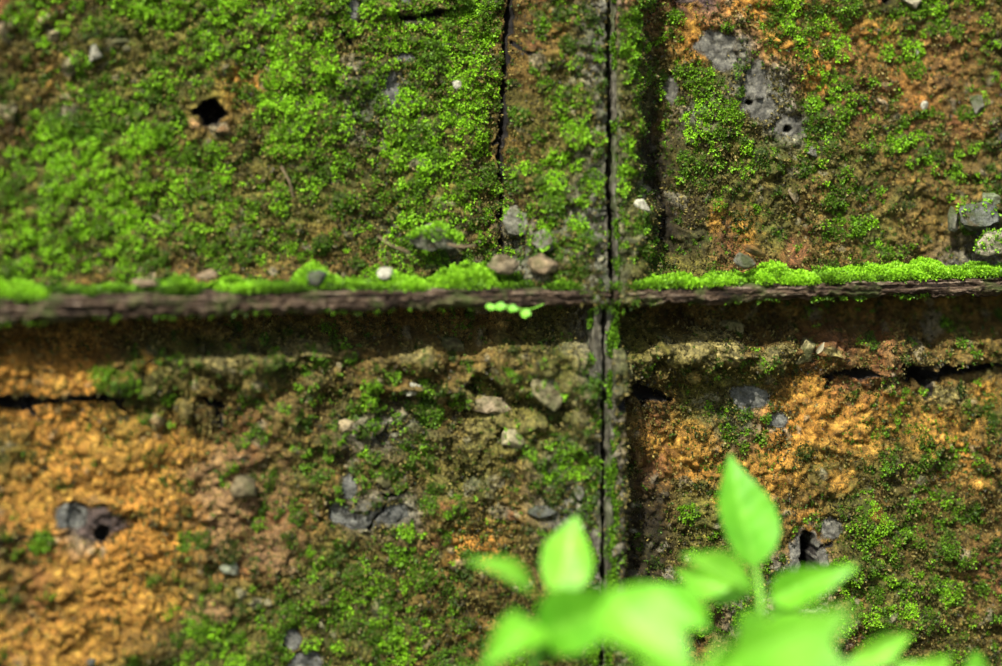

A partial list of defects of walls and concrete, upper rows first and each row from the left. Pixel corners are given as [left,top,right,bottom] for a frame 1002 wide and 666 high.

crack [491,0,533,255]
crack [820,362,1002,400]
crack [0,393,126,417]